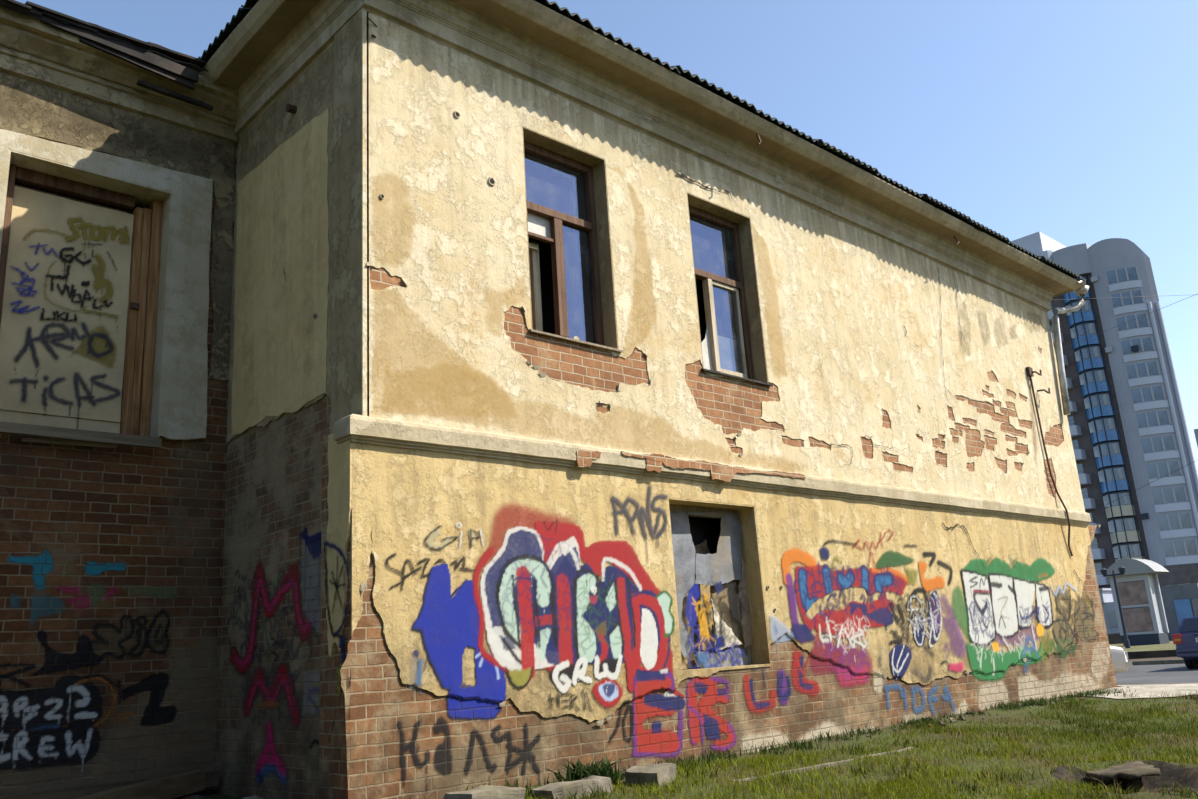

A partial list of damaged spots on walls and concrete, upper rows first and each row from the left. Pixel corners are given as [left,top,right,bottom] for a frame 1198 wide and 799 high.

crack [676,173,732,198]
spalling [366,261,408,290]
spalling [504,306,652,414]
spalling [575,450,601,468]
spalling [621,360,831,482]
spalling [882,408,891,429]
spalling [861,437,912,473]
spalling [916,370,1032,473]
spalling [1044,424,1064,499]
spalling [0,433,223,793]
spalling [340,525,1117,799]